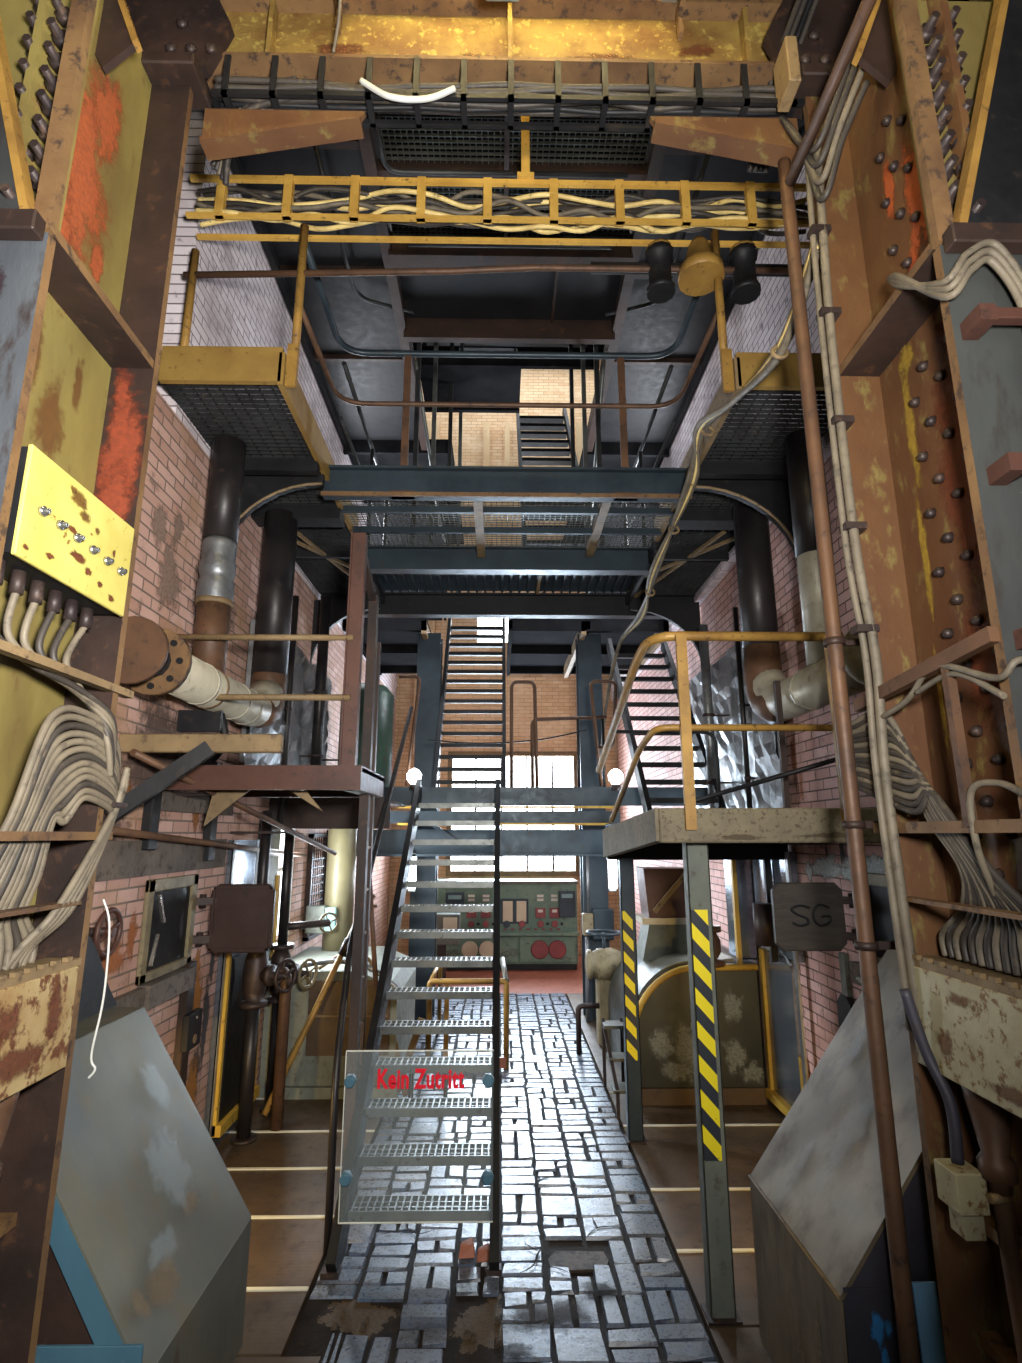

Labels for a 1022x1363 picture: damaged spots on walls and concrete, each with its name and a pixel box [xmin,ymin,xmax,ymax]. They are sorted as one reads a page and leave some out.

corrosion [883,147,928,272]
spalling [448,1293,506,1355]